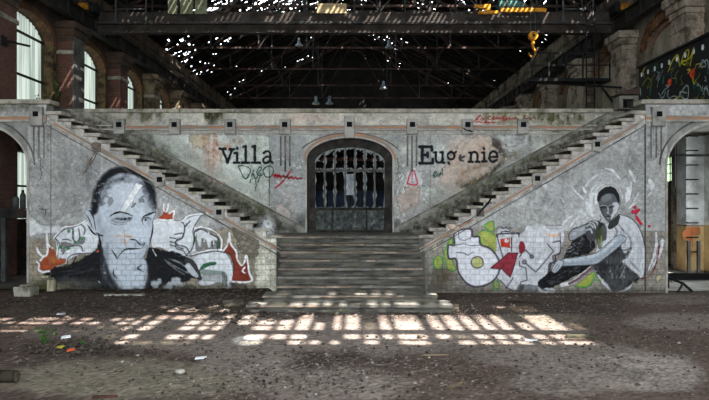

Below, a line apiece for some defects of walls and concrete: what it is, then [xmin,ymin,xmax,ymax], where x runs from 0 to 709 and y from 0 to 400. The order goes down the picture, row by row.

flaking render [440,134,524,185]